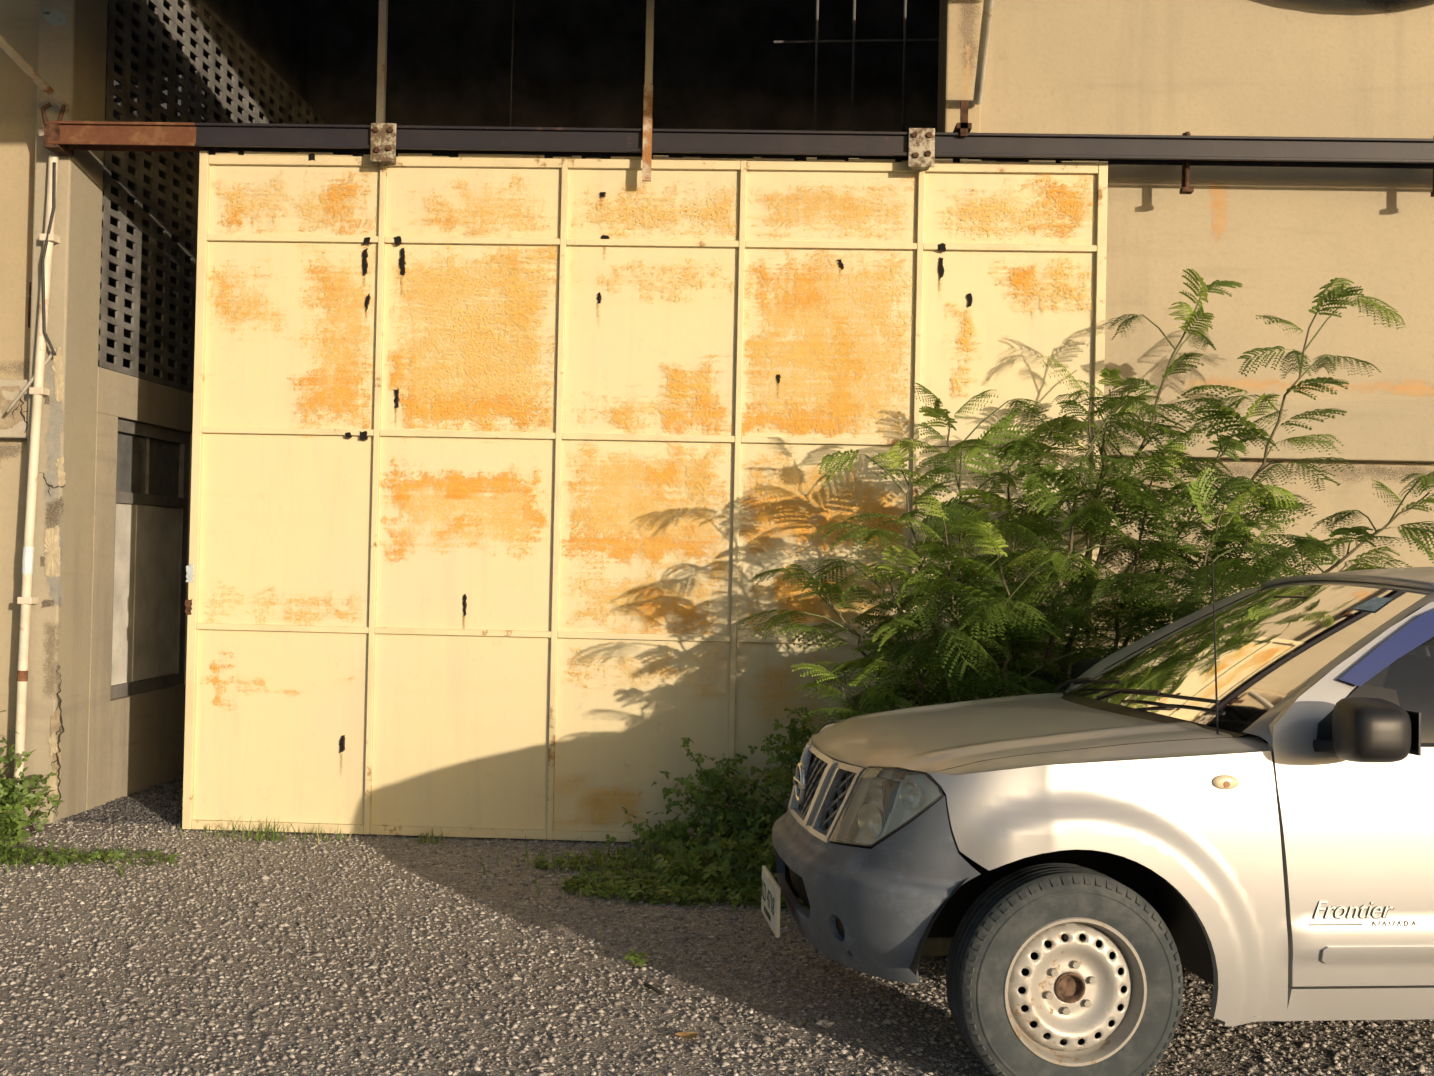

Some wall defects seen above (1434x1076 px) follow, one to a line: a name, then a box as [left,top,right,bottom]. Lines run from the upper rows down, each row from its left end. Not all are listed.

spalling [0,386,26,430]
flaking render [42,347,66,607]